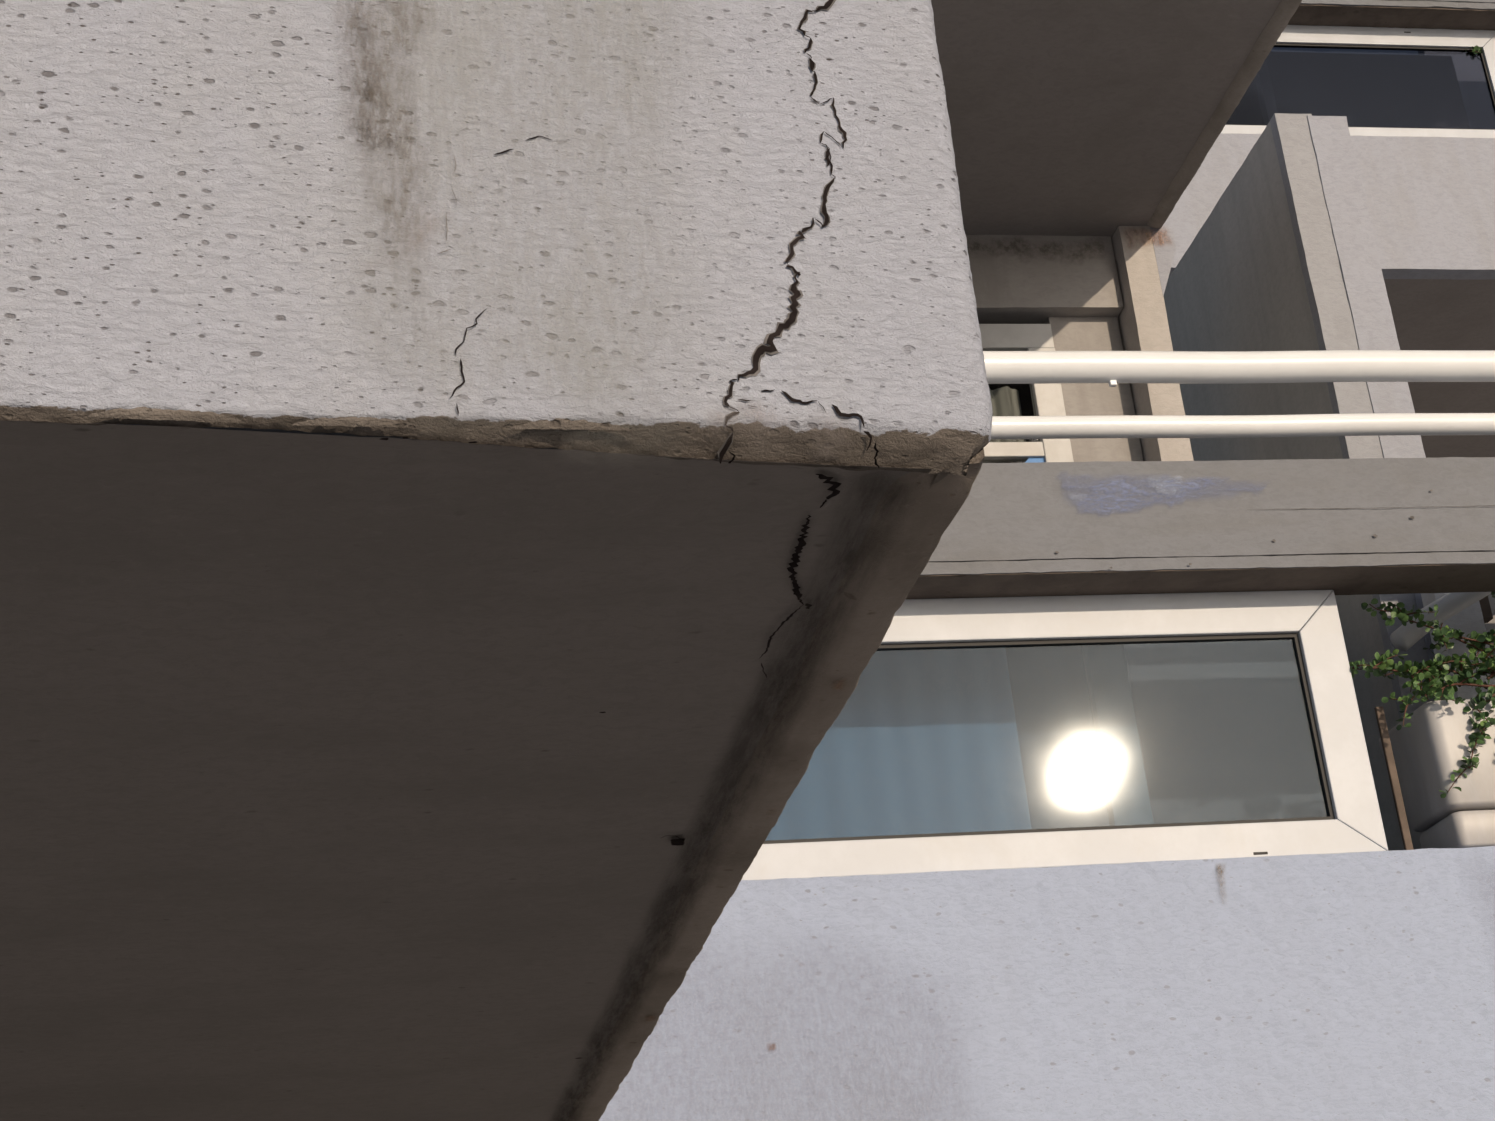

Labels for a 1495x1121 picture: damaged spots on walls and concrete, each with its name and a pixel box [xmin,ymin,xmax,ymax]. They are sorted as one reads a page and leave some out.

crack [717,0,879,678]